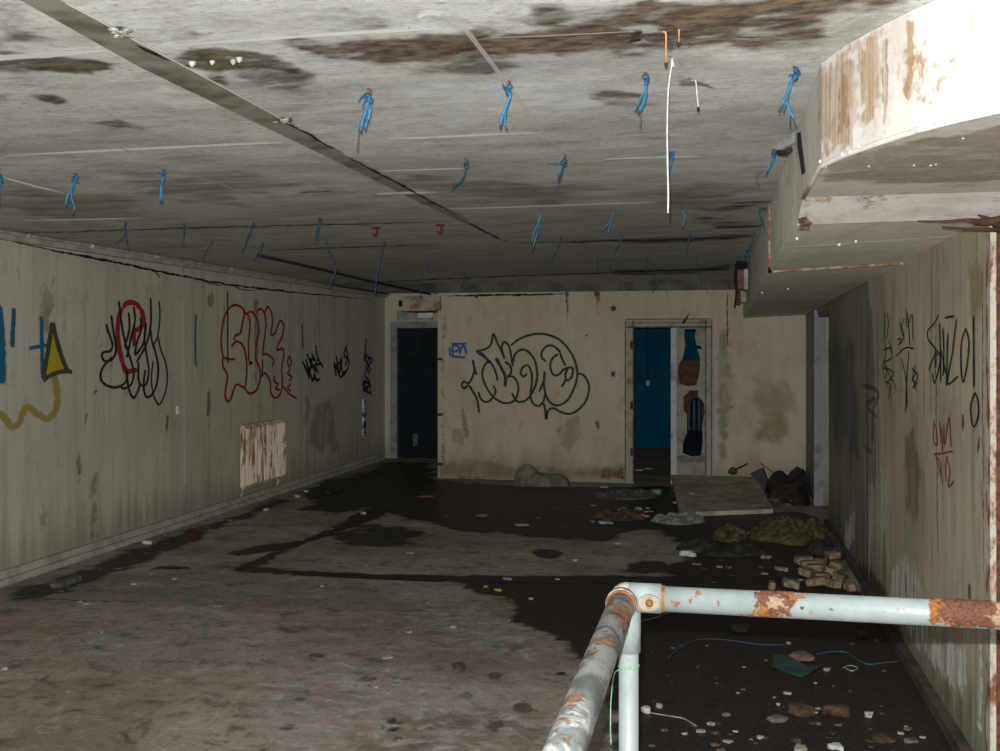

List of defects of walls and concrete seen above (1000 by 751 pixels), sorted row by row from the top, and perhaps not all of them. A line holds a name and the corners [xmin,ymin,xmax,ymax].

leakage [0,52,111,74]
leakage [177,49,312,89]
leakage [290,0,899,128]
corrosion [820,38,888,156]
corrosion [904,21,935,101]